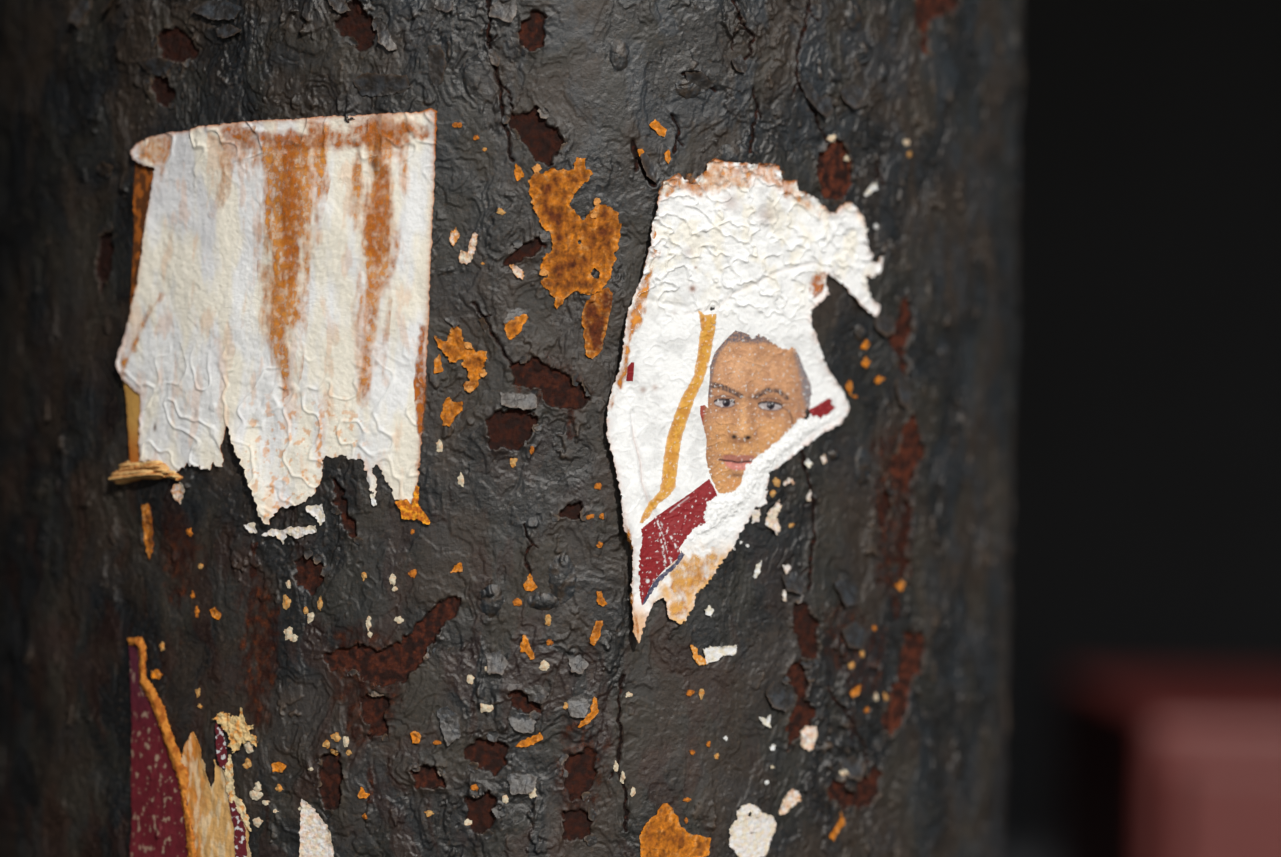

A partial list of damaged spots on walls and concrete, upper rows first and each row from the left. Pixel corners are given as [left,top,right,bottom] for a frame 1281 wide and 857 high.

rust [915,0,960,62]
crack [486,0,515,162]
crack [731,0,762,153]
crack [791,0,829,143]
crack [631,140,656,187]
rust [504,229,551,266]
peeling [500,390,537,410]
peeling [467,650,509,685]
peeling [480,660,550,733]
peeling [563,694,590,718]
crack [609,674,629,832]
peeling [502,771,537,804]